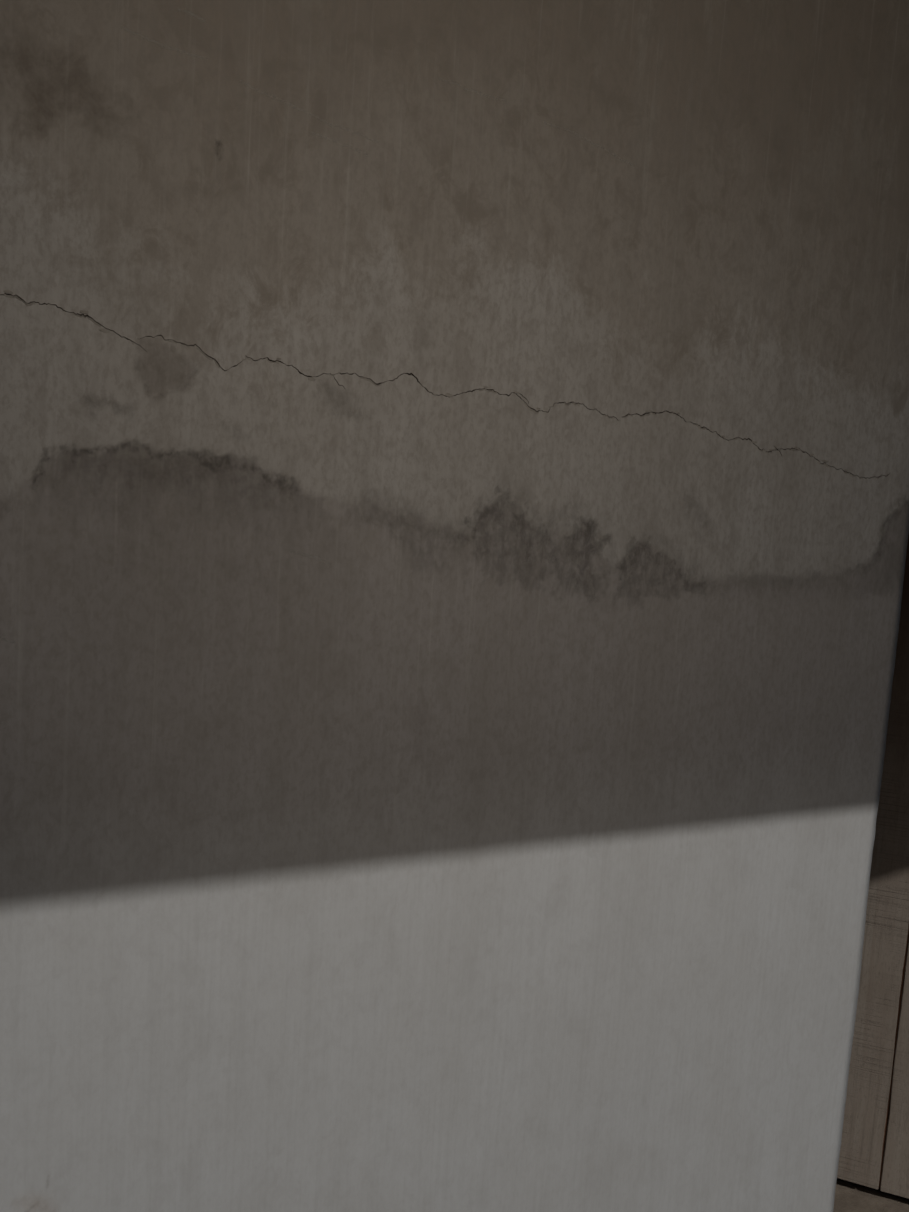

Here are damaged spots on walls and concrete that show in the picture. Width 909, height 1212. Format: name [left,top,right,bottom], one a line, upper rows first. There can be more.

crack [0,290,890,479]